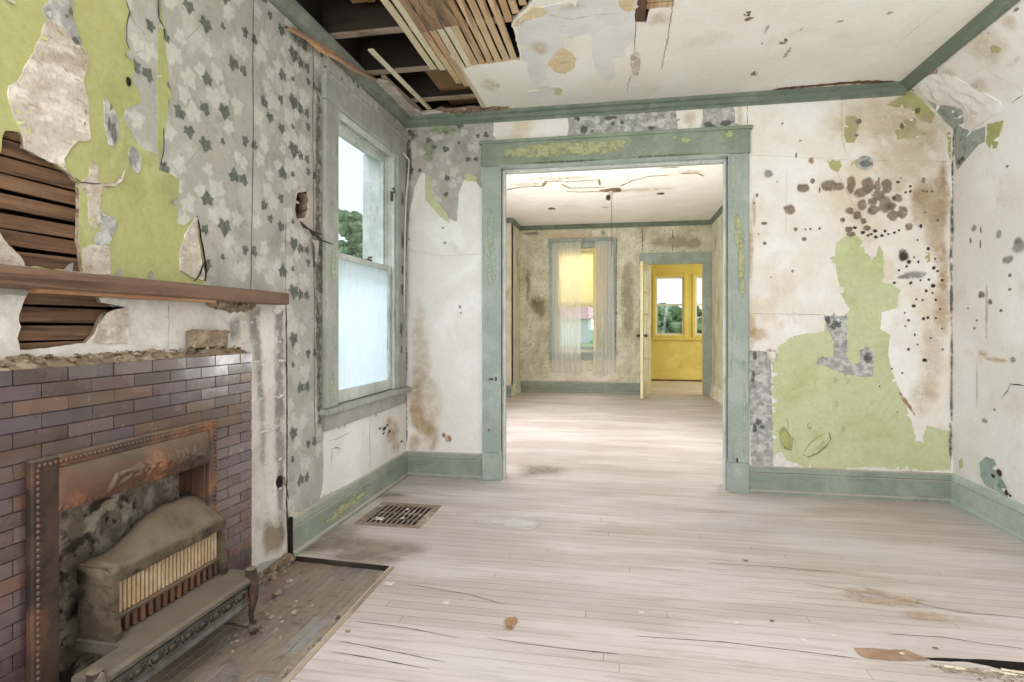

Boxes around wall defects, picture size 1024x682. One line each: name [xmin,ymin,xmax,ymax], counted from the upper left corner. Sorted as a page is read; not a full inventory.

peeling [513,0,640,97]
spalling [7,20,122,277]
water stain [406,130,416,185]
spalling [504,139,626,164]
spalling [0,235,25,266]
spalling [179,217,205,280]
water stain [797,138,964,456]
flaking render [0,294,288,566]
peeling [979,457,1008,498]